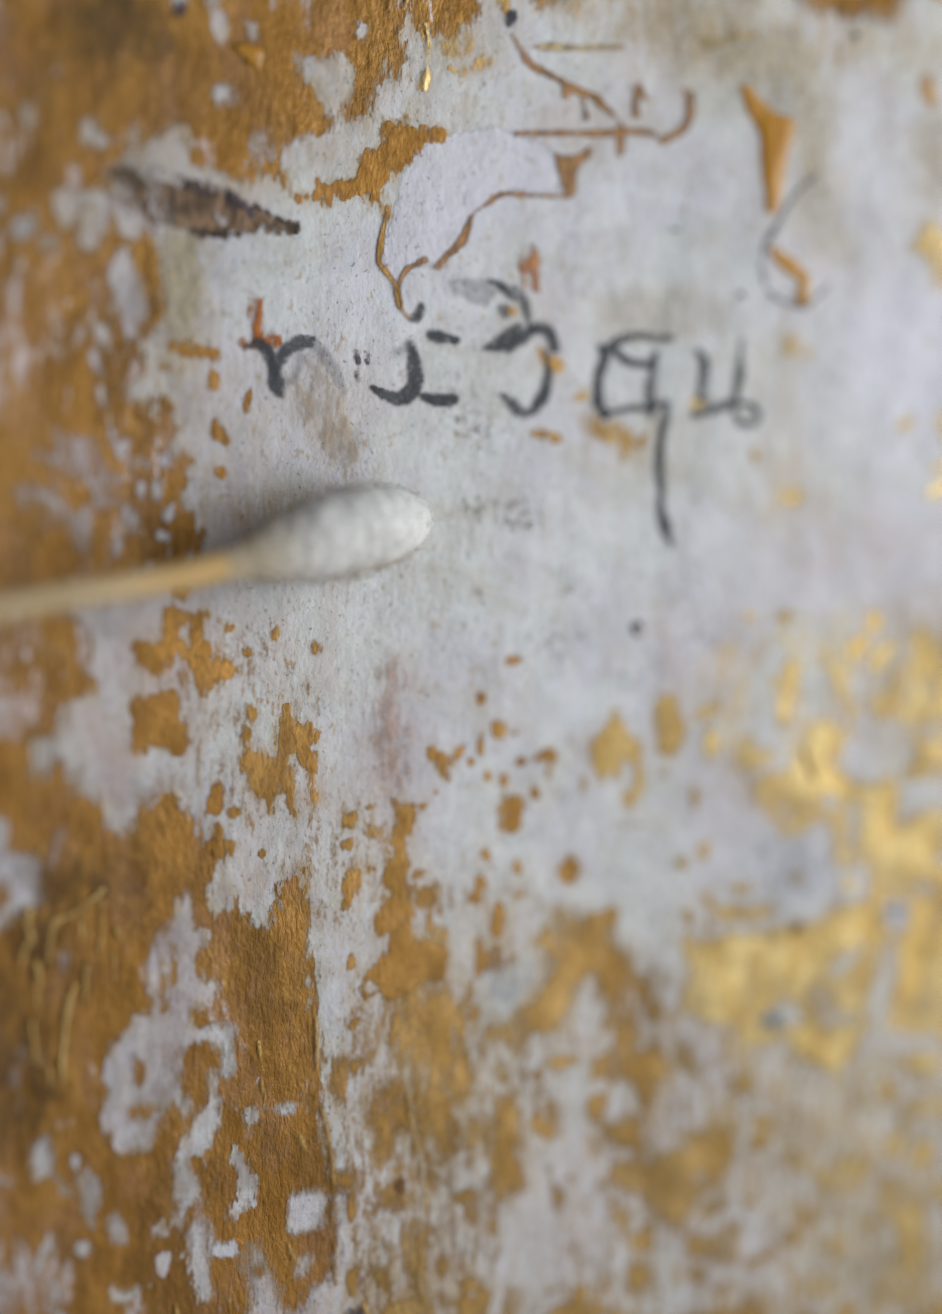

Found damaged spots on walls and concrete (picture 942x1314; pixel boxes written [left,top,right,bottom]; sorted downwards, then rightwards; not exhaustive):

peeling [205,0,261,46]
peeling [355,20,369,41]
peeling [213,84,236,108]
peeling [49,183,116,252]
spalling [113,165,301,241]
peeling [109,243,149,342]
peeling [88,321,112,374]
peeling [0,817,48,928]
peeling [100,889,239,1305]
peeling [28,1135,128,1257]
peeling [224,1144,258,1220]
peeling [286,1189,327,1235]